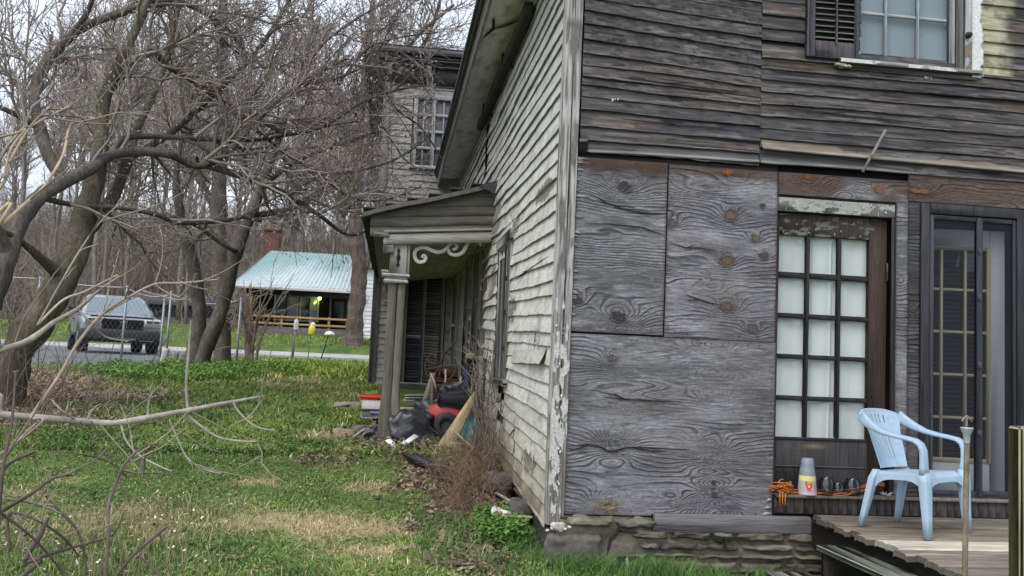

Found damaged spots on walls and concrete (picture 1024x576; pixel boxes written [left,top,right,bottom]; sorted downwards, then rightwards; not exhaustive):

peeling [566,21,582,74]
peeling [779,197,895,240]
peeling [521,103,588,532]